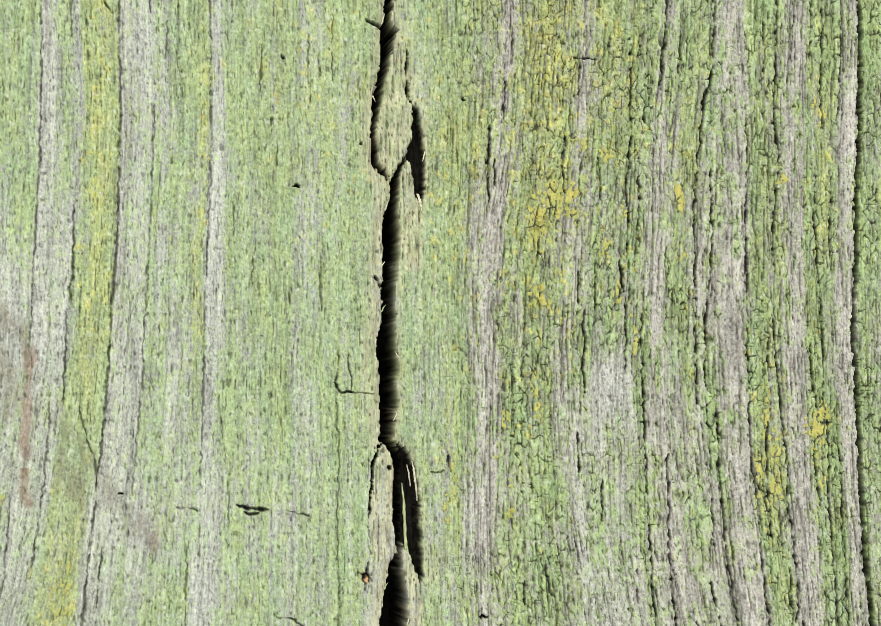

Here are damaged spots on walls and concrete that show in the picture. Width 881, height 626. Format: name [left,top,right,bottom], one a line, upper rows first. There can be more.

crack [333,0,452,626]